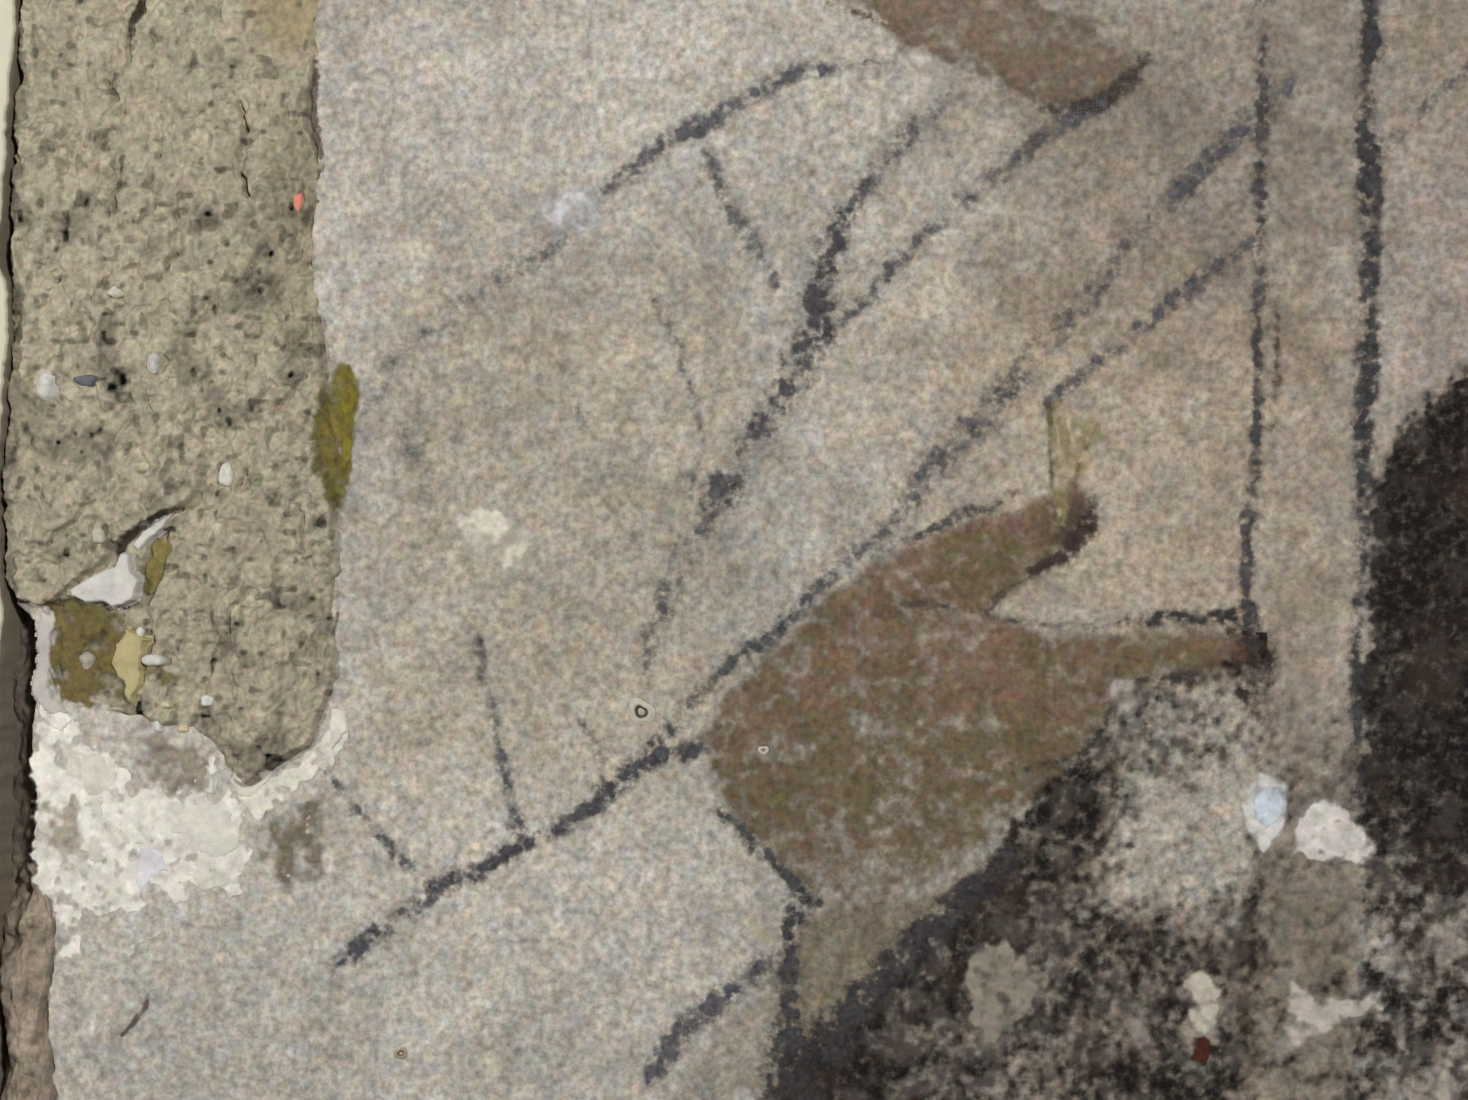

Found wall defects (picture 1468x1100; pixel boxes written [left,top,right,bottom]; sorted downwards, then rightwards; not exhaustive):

crack [129,0,144,39]
spalling [2,0,349,986]
crack [117,509,175,554]
peeling [1295,800,1375,864]